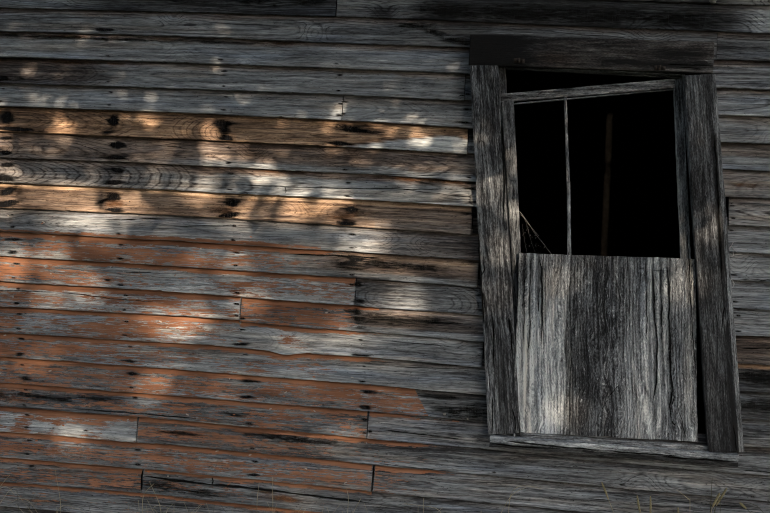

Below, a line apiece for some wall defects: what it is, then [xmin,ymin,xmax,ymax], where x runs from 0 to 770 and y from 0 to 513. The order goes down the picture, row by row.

peeling [0,221,453,513]
water stain [336,258,447,271]
crack [492,396,770,473]
crack [645,263,686,437]
crack [687,235,696,375]